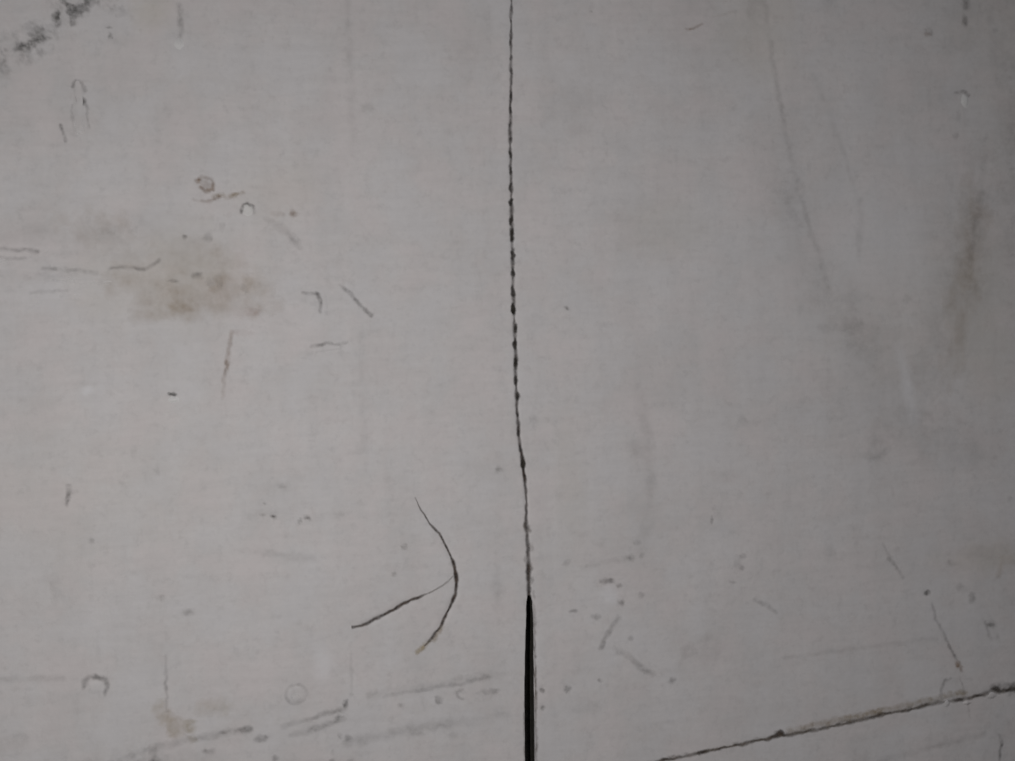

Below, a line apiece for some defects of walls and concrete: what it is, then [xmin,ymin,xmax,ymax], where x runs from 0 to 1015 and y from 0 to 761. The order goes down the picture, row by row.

crack [509,76,536,761]
crack [351,595,422,628]
crack [419,507,458,650]
crack [659,687,1015,761]